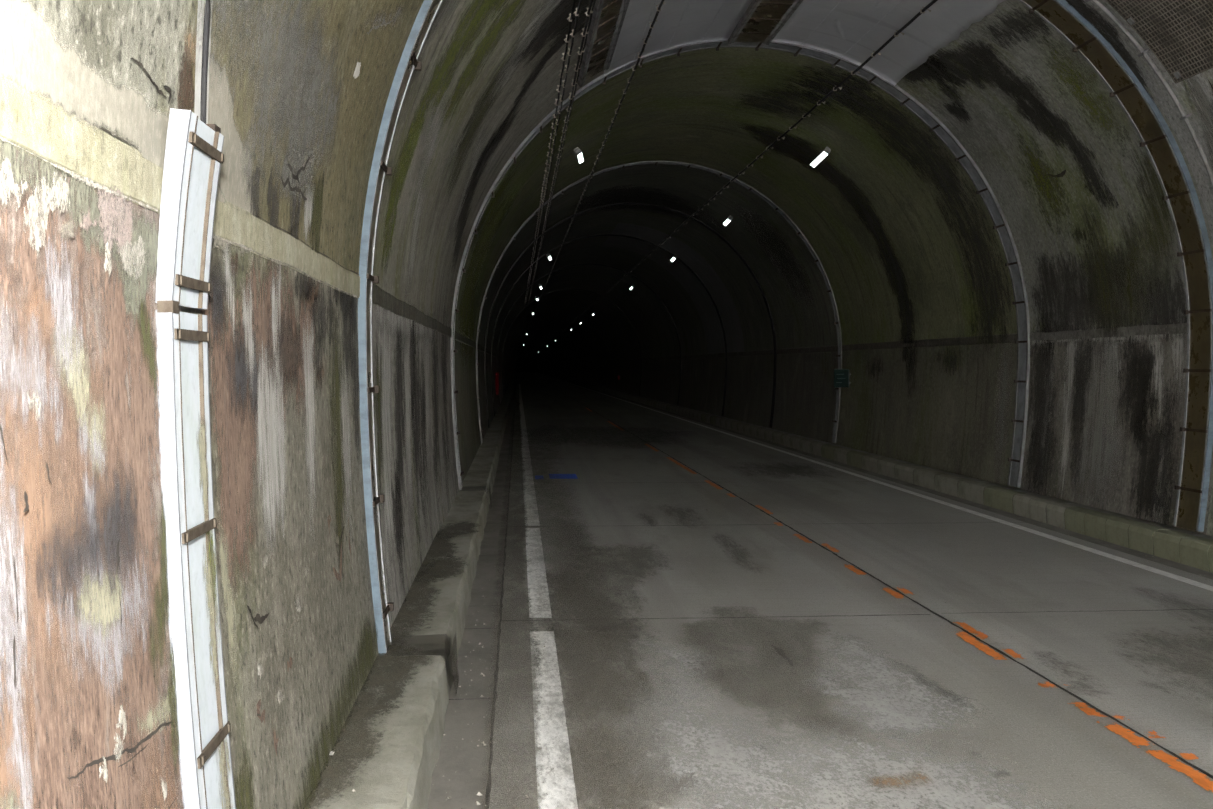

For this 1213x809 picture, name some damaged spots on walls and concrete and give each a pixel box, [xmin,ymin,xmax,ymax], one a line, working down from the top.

crack [131,57,172,116]
damp [201,0,341,253]
damp [444,0,594,272]
damp [904,0,1187,524]
damp [0,239,179,809]
damp [220,532,236,682]
damp [210,252,360,586]